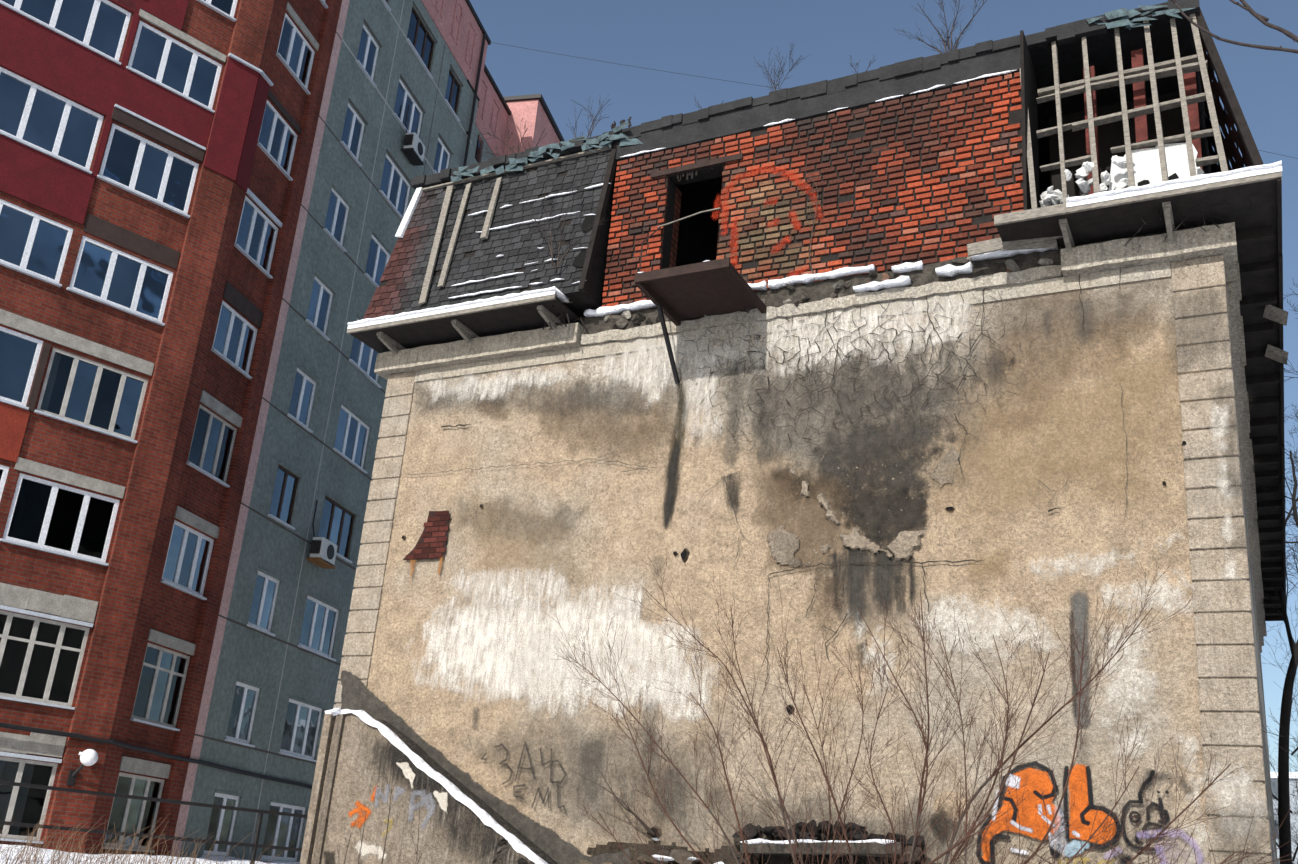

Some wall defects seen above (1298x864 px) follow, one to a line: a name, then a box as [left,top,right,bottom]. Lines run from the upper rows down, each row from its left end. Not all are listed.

crack [679,276,1033,479]
spalling [403,511,451,560]
water stain [431,296,968,682]
crack [696,479,754,559]
crack [765,560,984,689]
efflorescence [923,599,1049,650]
efflorescence [1129,580,1187,611]
efflorescence [1104,628,1153,712]